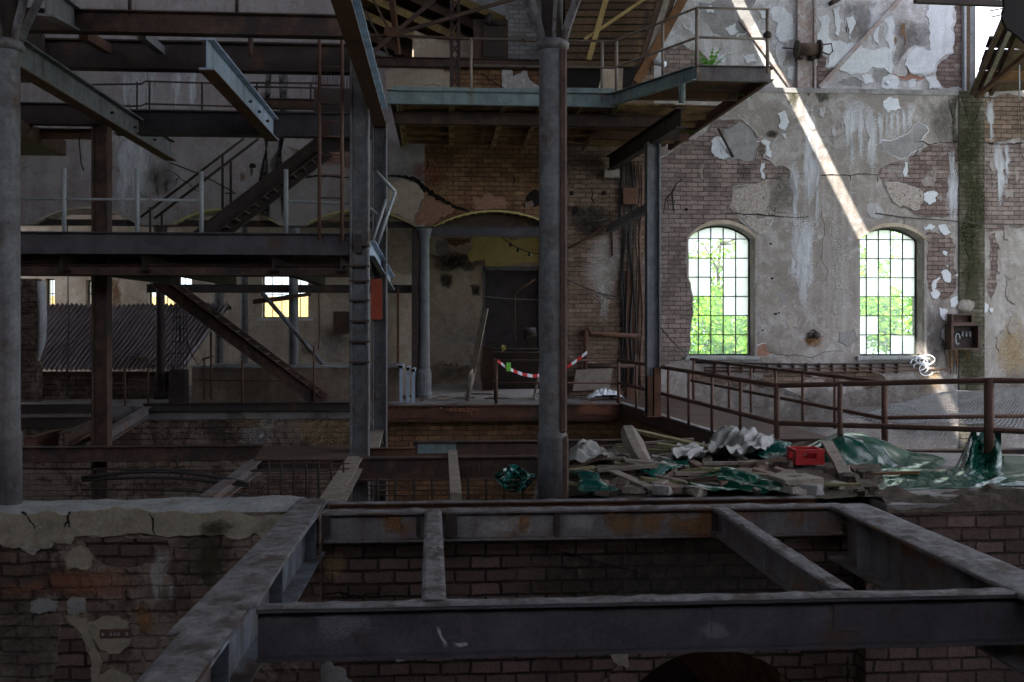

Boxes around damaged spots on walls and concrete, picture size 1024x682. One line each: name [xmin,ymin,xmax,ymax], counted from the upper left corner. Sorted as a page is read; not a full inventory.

peeling [817,1,962,113]
crack [387,158,470,213]
flaking render [661,117,795,370]
peeling [777,111,789,139]
water stain [775,130,819,212]
efflorescence [792,235,811,293]
crack [792,173,878,181]
efflorescence [844,111,912,157]
flaking render [867,121,959,235]
flaking render [985,93,1024,313]
flaking render [75,534,172,570]
flaking render [53,596,92,682]